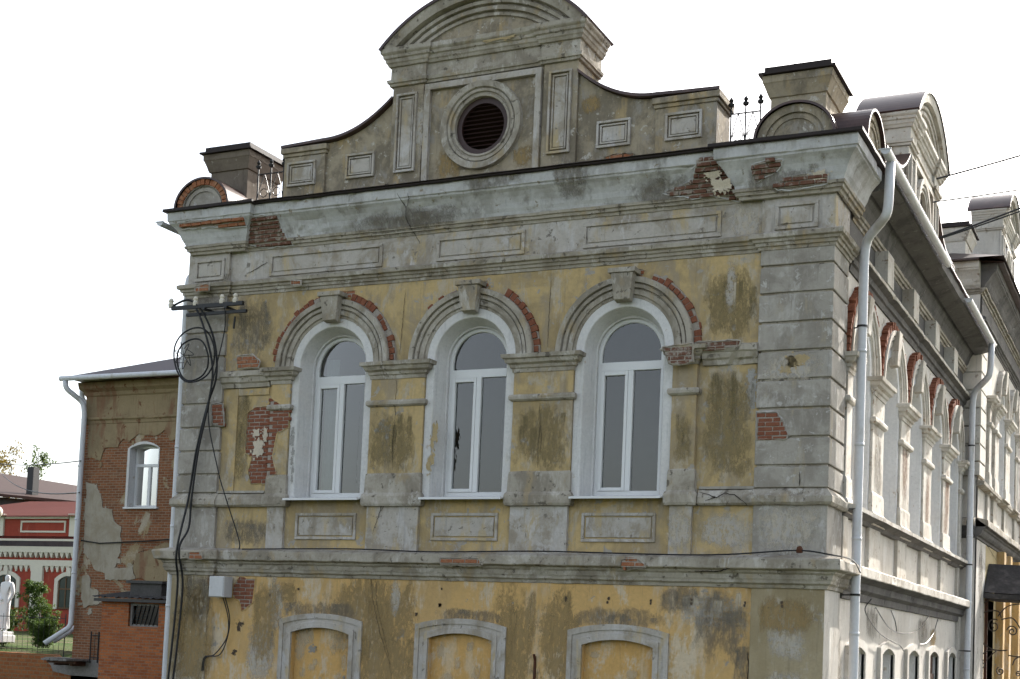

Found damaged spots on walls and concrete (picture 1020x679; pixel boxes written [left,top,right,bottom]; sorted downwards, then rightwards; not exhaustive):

flaking render [177,179,226,208]
flaking render [662,155,740,202]
flaking render [750,157,833,191]
flaking render [177,214,294,249]
flaking render [236,353,261,369]
flaking render [273,297,321,362]
water stain [708,269,755,336]
flaking render [745,368,789,441]
flaking render [244,398,295,486]
peeling [76,482,169,615]
water stain [448,592,656,679]